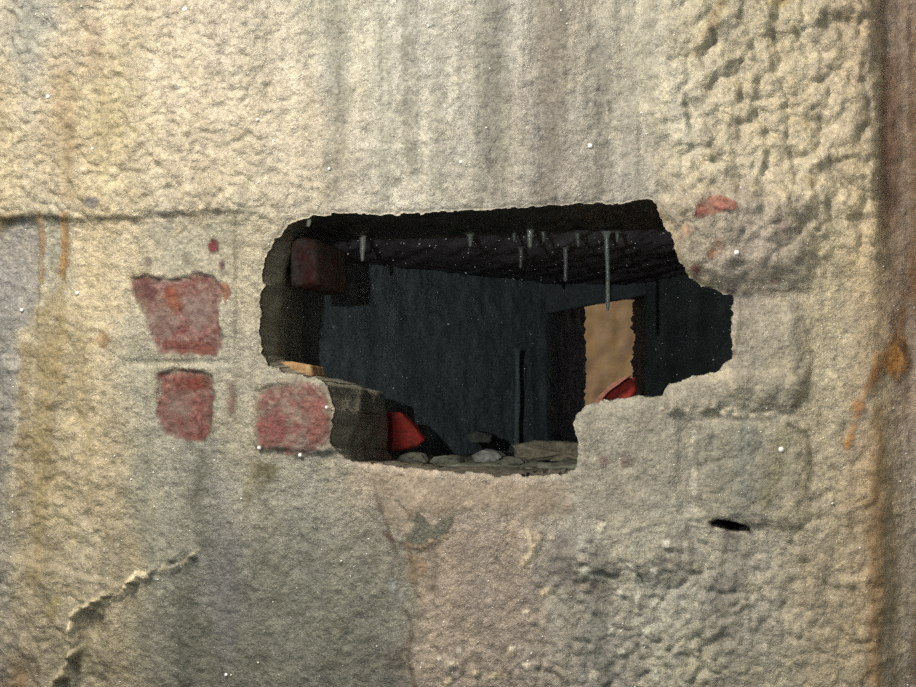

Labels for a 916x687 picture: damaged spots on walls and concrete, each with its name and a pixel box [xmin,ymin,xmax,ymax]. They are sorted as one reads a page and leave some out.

spalling [694,196,737,217]
peeling [133,215,236,355]
spalling [290,237,347,295]
rust [853,327,911,409]
peeling [157,369,214,441]
spalling [254,382,331,454]